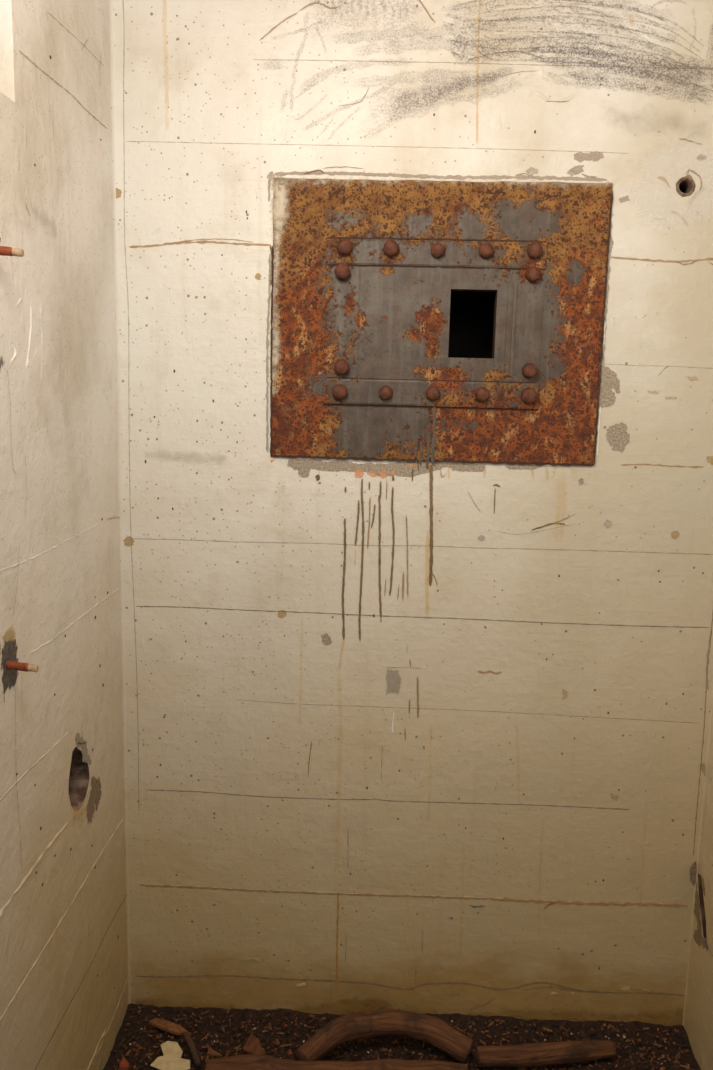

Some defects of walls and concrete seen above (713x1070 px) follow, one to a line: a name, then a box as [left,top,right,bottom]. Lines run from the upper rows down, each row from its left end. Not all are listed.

crack [468,51,543,60]
crack [130,238,269,248]
crack [611,257,713,265]
corrosion [270,191,613,586]
crack [622,462,702,470]
corrosion [342,476,408,641]
spalling [75,731,102,823]
crack [137,606,713,866]
spalling [690,861,708,951]
crack [135,975,682,1009]